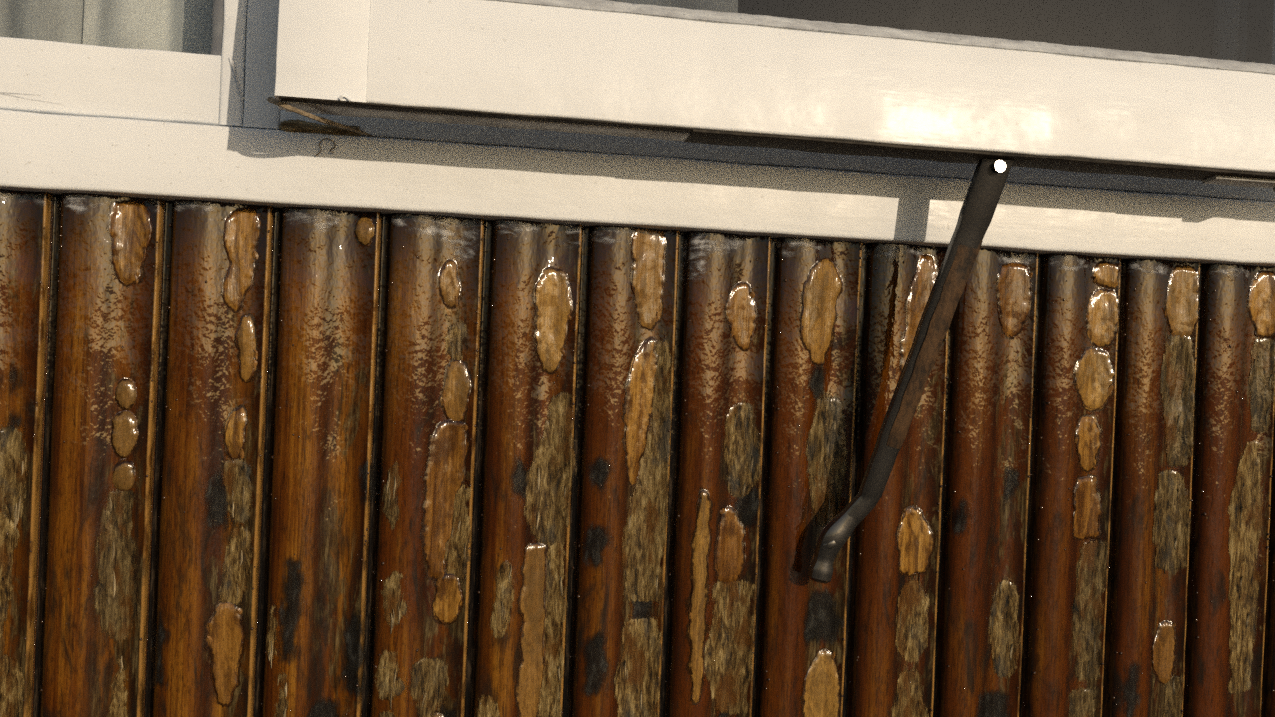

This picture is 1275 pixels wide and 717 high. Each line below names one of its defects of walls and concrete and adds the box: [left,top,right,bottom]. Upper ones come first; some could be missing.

peeling [221,206,262,383]
peeling [533,266,575,374]
peeling [622,229,667,486]
damp [809,368,824,398]
peeling [1072,260,1120,540]
peeling [420,358,474,625]
damp [590,458,609,487]
peeling [204,601,246,707]
damp [280,559,303,661]
damp [583,525,608,567]
peeling [685,488,746,705]
peeling [800,648,842,717]